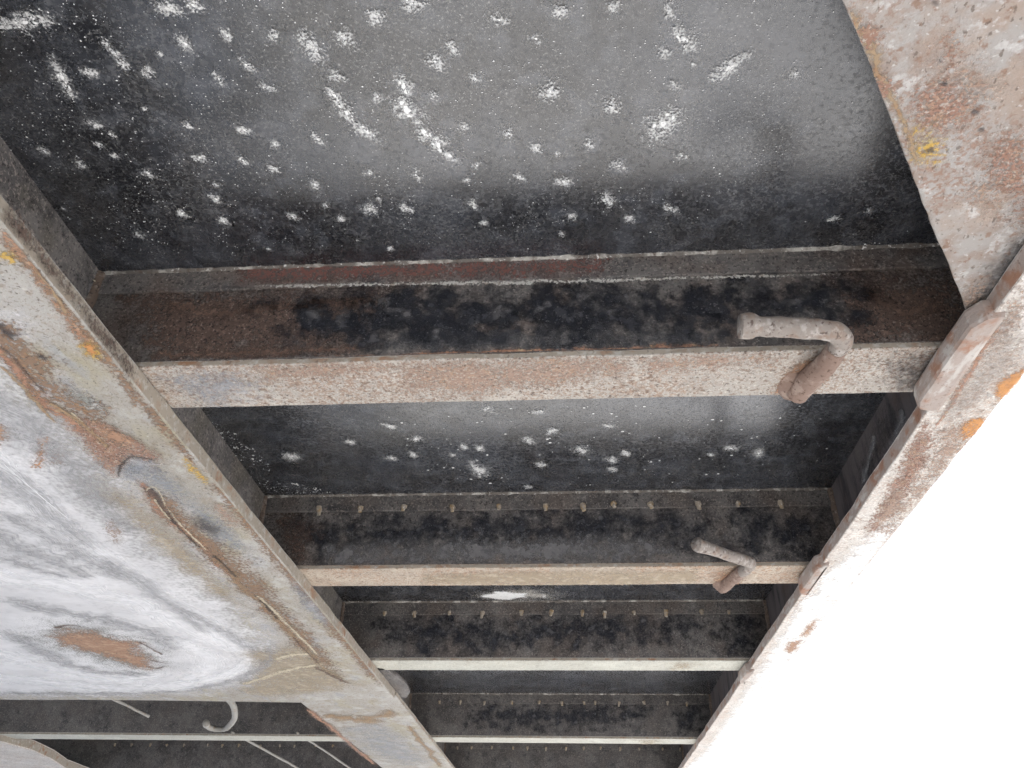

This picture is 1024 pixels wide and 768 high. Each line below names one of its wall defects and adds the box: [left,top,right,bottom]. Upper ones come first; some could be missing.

water stain [0,363,351,697]
corrosion [0,206,816,683]
water stain [256,273,826,288]
corrosion [850,12,1024,234]